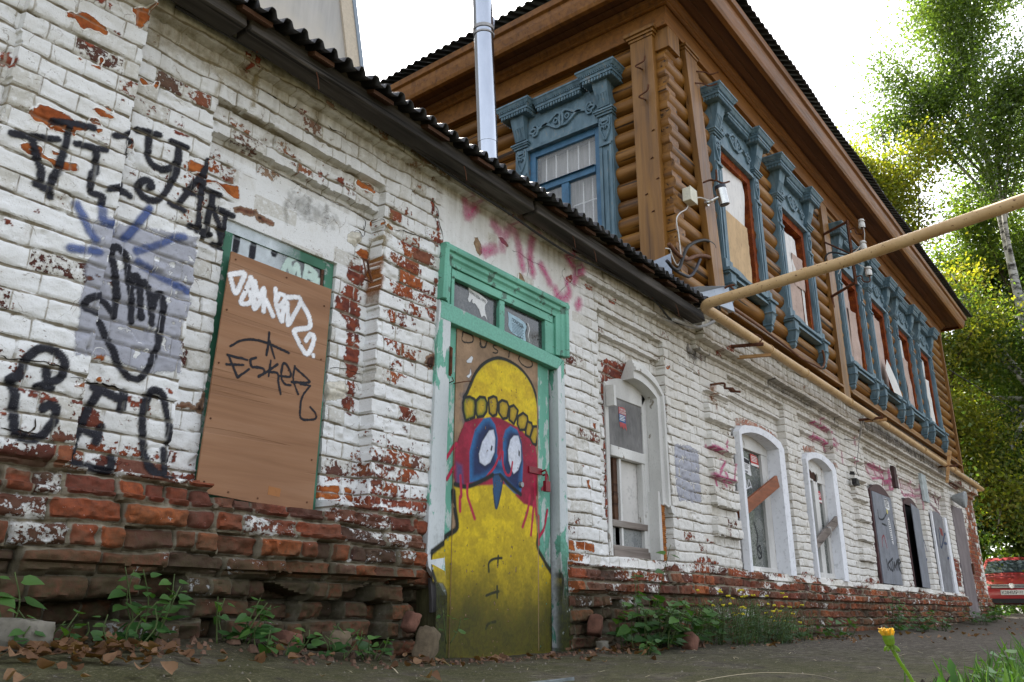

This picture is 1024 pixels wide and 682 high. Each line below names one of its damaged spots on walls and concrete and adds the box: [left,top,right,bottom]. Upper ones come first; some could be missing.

peeling [0,52,18,68]
peeling [65,10,121,71]
peeling [27,103,116,138]
peeling [19,141,80,173]
peeling [186,158,275,226]
peeling [337,177,376,195]
peeling [431,198,443,247]
peeling [400,262,438,322]
peeling [335,248,370,416]
spalling [424,353,435,370]
peeling [581,358,626,523]
peeling [316,433,427,517]